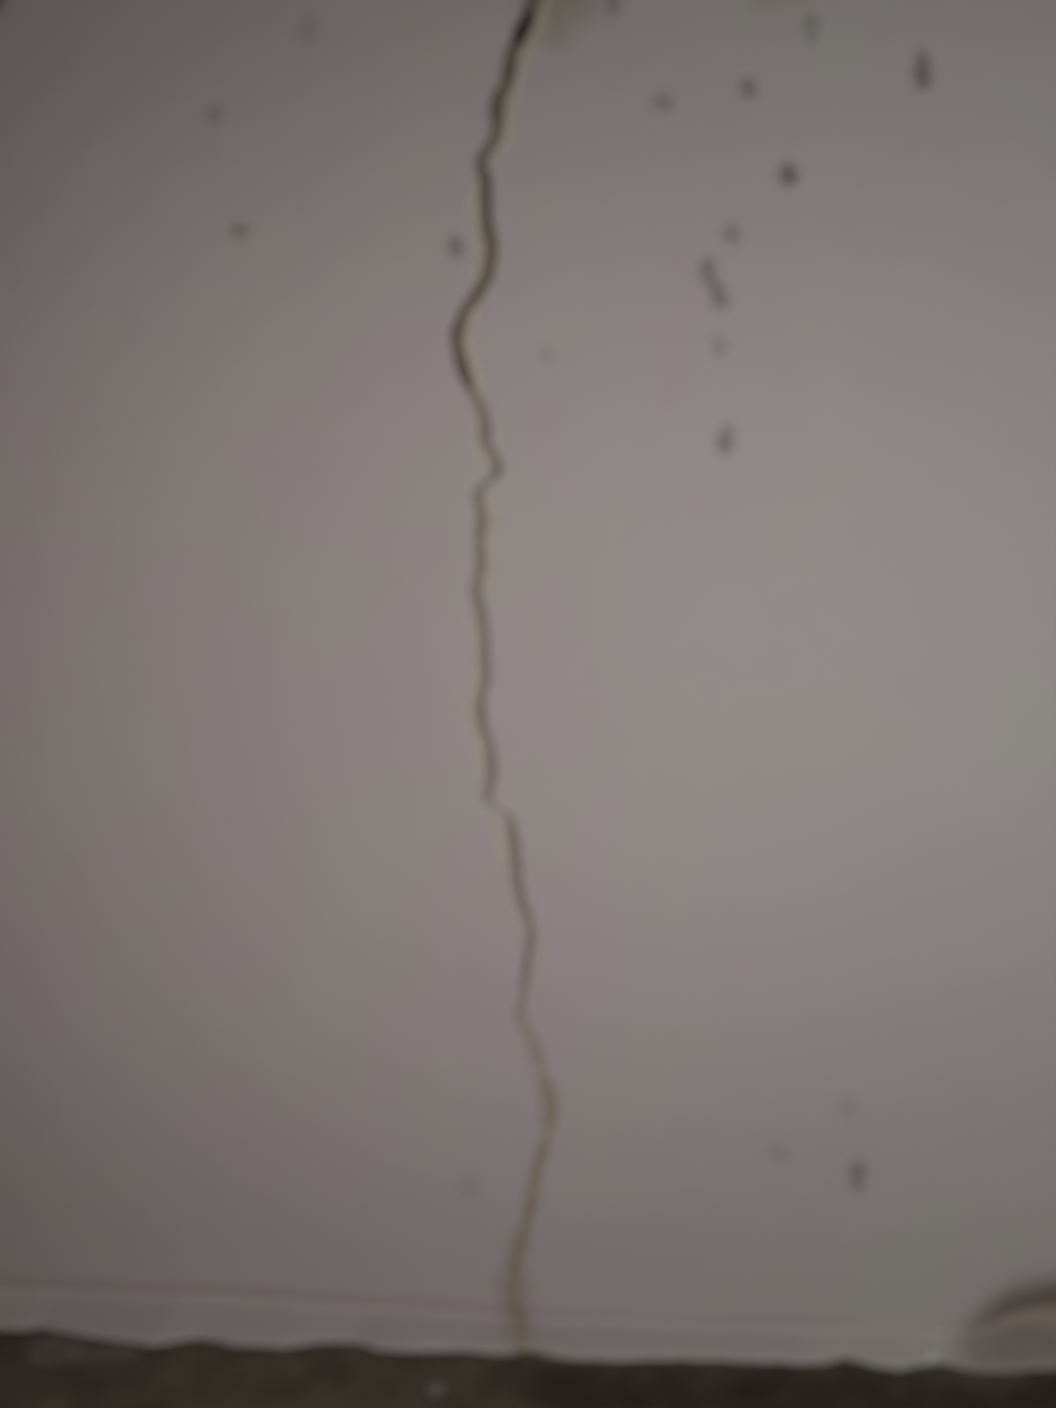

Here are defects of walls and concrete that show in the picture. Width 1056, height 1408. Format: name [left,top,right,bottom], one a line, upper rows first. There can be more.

crack [450,0,556,1354]